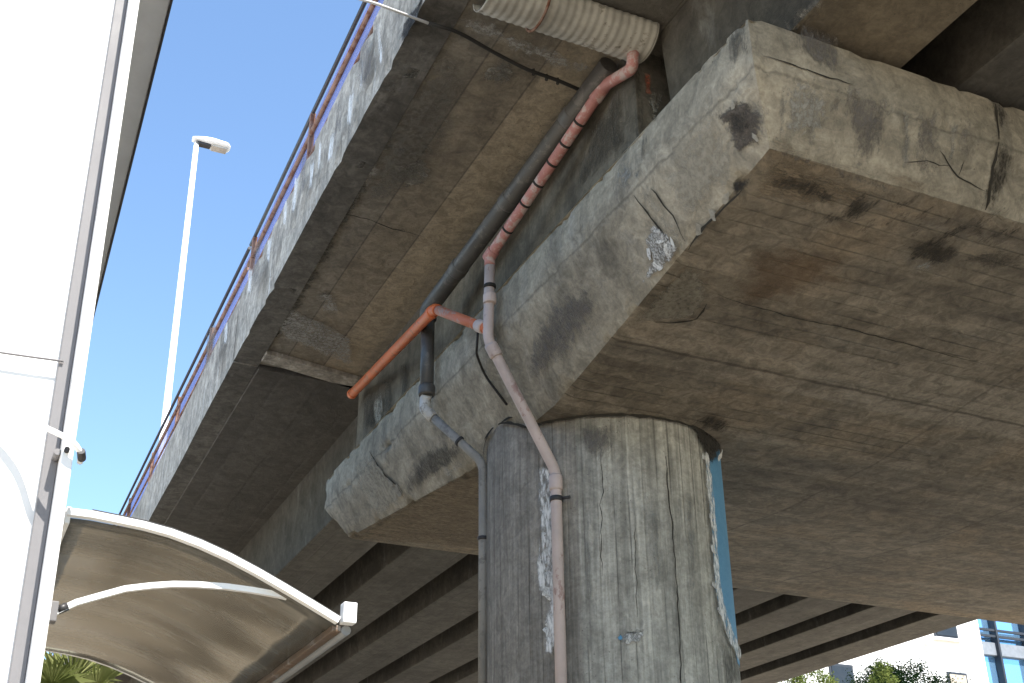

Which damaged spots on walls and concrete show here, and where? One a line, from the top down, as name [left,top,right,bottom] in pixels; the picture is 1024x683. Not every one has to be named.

crack [765,56,850,84]
crack [911,104,1000,210]
crack [634,190,685,246]
spalling [646,181,748,271]
leakage [909,219,1020,269]
peeling [537,469,564,653]
crack [598,447,606,574]
crack [665,456,682,683]
peeling [695,417,741,660]